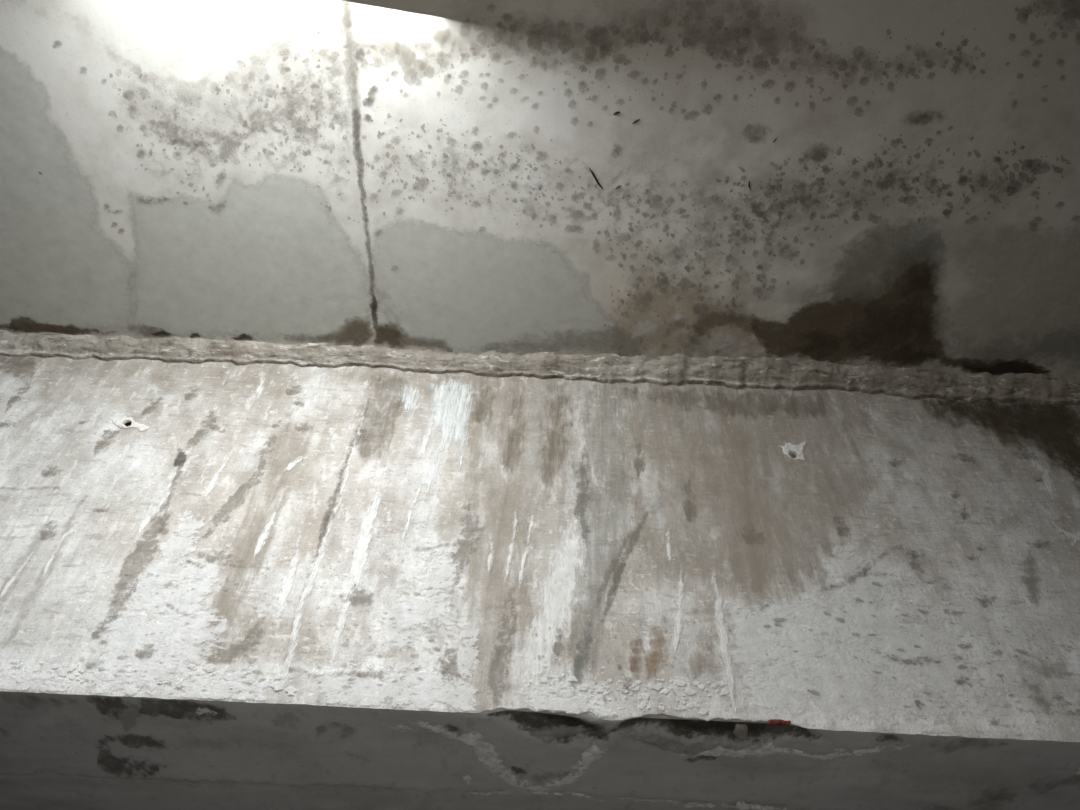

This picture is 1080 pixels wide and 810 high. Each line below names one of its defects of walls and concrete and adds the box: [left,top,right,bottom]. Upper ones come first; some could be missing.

crack [342,0,378,328]
water stain [678,240,1049,375]
water stain [92,412,225,638]
water stain [199,513,275,578]
water stain [277,557,316,675]
water stain [331,496,380,664]
peeling [300,547,479,711]
water stain [403,379,480,539]
water stain [452,491,533,612]
peeling [488,519,820,756]
water stain [712,577,736,711]
water stain [928,400,1080,477]